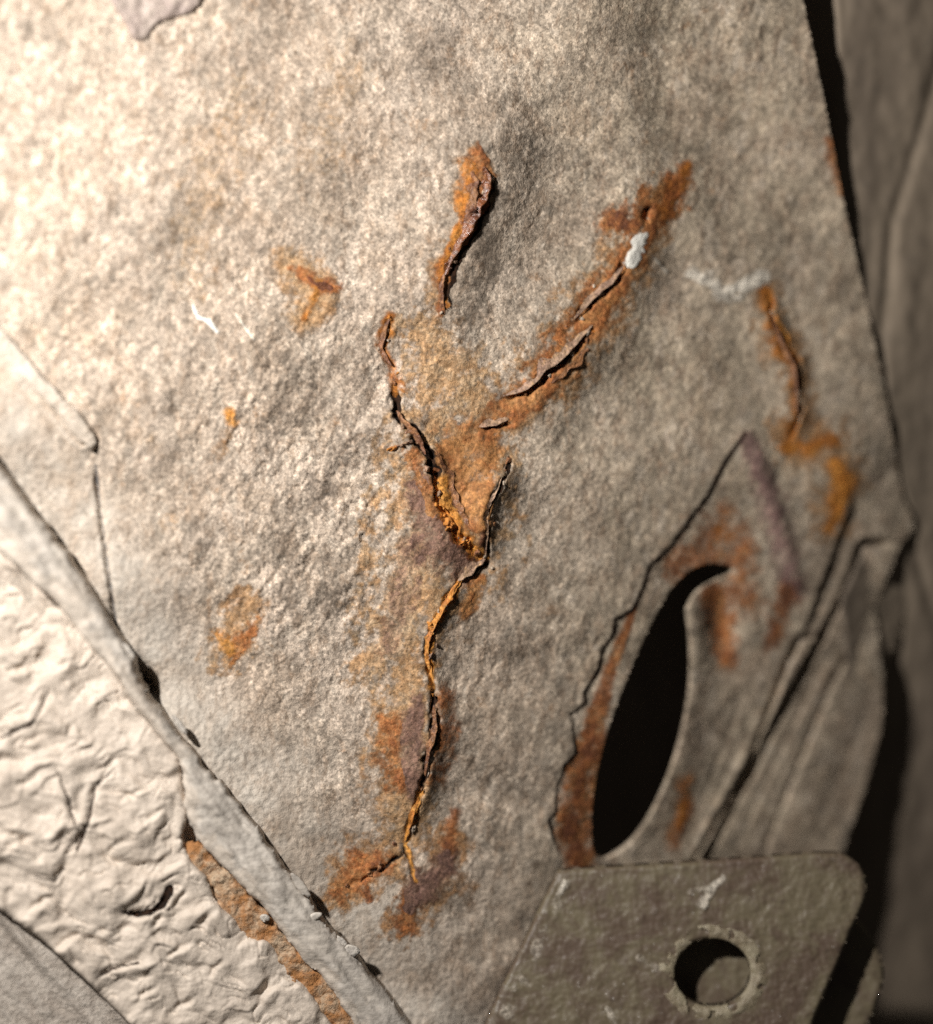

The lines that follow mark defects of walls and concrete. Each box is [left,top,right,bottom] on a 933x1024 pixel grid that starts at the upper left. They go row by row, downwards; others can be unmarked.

corrosion [273,247,342,334]
crack [426,141,496,324]
corrosion [600,161,691,233]
corrosion [206,584,270,676]
corrosion [318,301,531,941]
crack [345,184,681,888]
crack [548,431,747,852]
corrosion [766,412,868,544]
corrosion [555,607,637,867]
corrosion [185,840,354,1024]